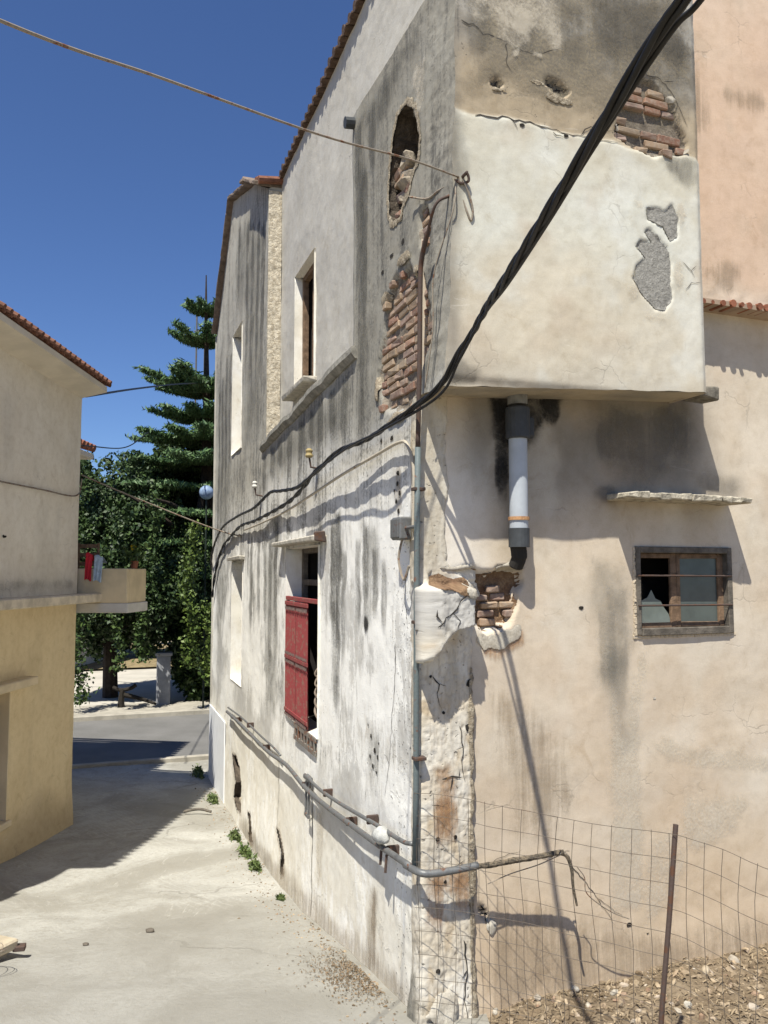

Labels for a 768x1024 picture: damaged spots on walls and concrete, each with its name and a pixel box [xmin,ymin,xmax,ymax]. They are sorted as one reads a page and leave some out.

spalling [386,97,426,228]
crack [462,20,566,69]
crack [477,114,618,143]
water stain [476,0,673,109]
spalling [614,81,689,159]
water stain [638,30,687,124]
peeling [632,205,685,310]
spalling [374,238,432,423]
water stain [491,398,509,492]
water stain [526,399,560,442]
spalling [428,561,525,650]
crack [432,677,466,807]